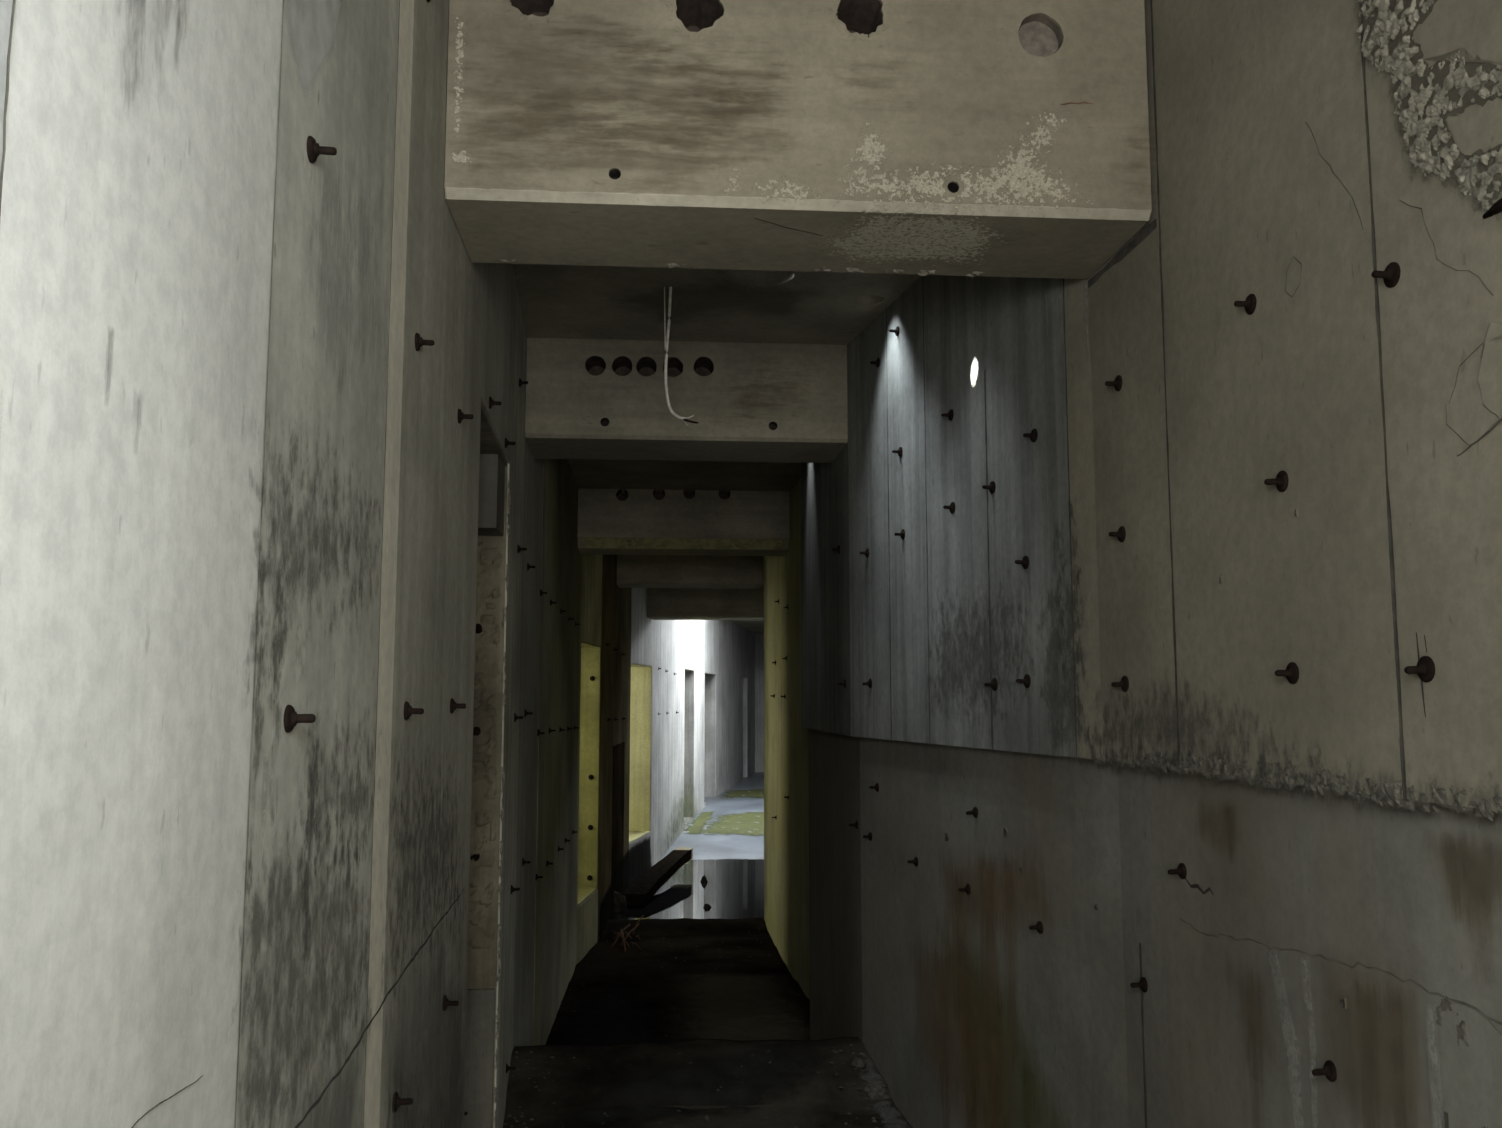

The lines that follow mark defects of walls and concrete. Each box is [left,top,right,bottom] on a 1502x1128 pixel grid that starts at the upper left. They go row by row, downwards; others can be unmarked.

leakage [450,17,471,164]
peeling [722,105,1094,277]
spalling [1356,0,1502,217]
crack [1400,200,1493,296]
leakage [257,446,371,693]
leakage [243,728,373,1128]
crack [295,890,463,1128]
crack [1180,878,1502,1035]
crack [131,1075,203,1128]